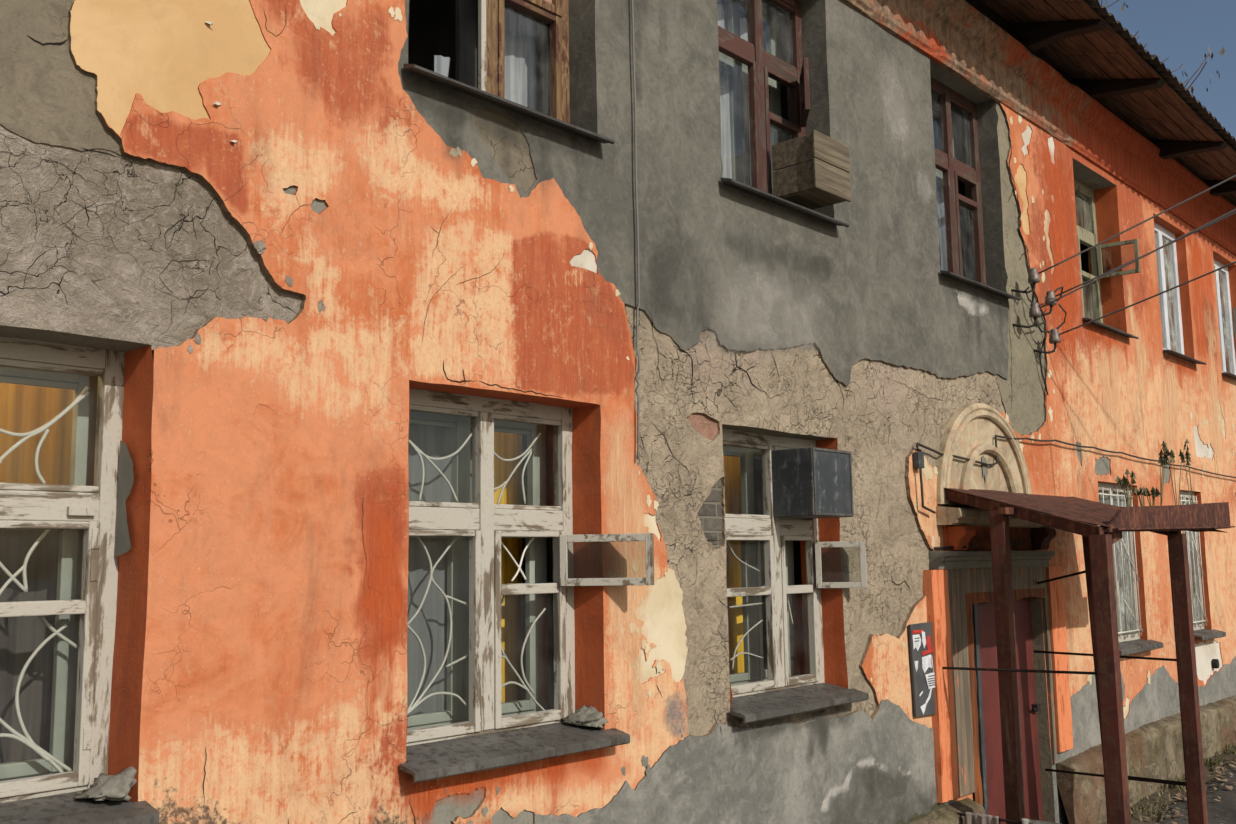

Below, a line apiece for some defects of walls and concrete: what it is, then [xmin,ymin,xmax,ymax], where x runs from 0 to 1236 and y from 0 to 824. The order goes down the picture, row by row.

peeling [300,0,348,36]
flaking render [0,0,326,353]
crack [0,147,214,336]
crack [650,311,938,449]
crack [641,425,700,513]
flaking render [421,102,1057,824]
peeling [1184,399,1234,482]
peeling [1123,670,1156,719]
peeling [1195,641,1235,687]